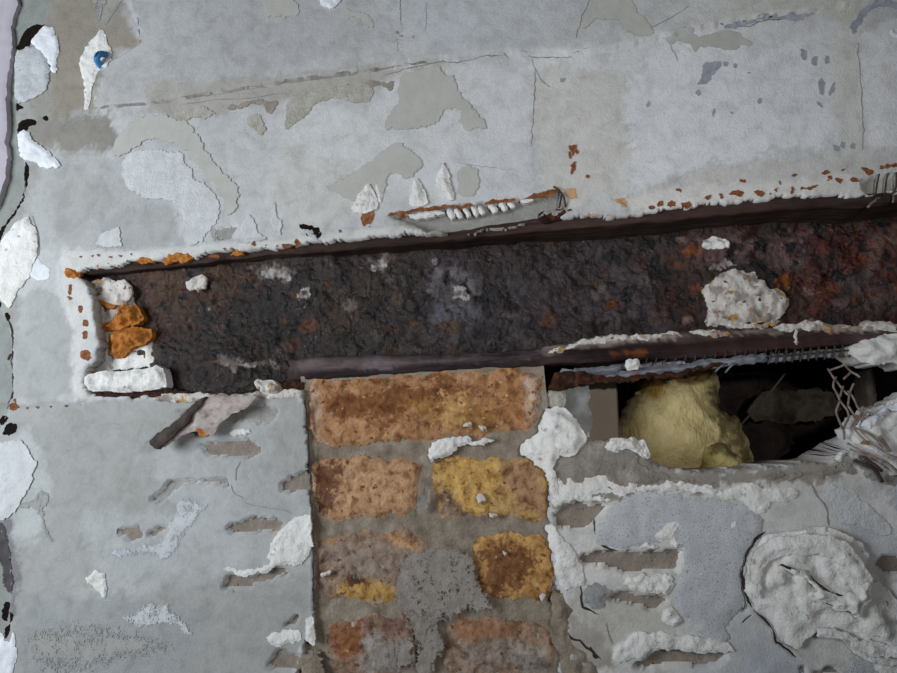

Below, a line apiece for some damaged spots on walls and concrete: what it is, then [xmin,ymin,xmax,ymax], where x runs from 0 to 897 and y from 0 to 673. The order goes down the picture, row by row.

crack [95,1,589,141]
peeling [228,65,486,135]
rust [485,188,627,225]
rust [79,252,195,270]
rust [64,268,88,339]
rust [96,294,156,359]
rust [96,389,189,399]
spalling [717,358,897,462]
flaking render [225,568,289,588]
crack [740,531,796,658]
crack [779,564,852,614]
peeling [0,632,18,673]